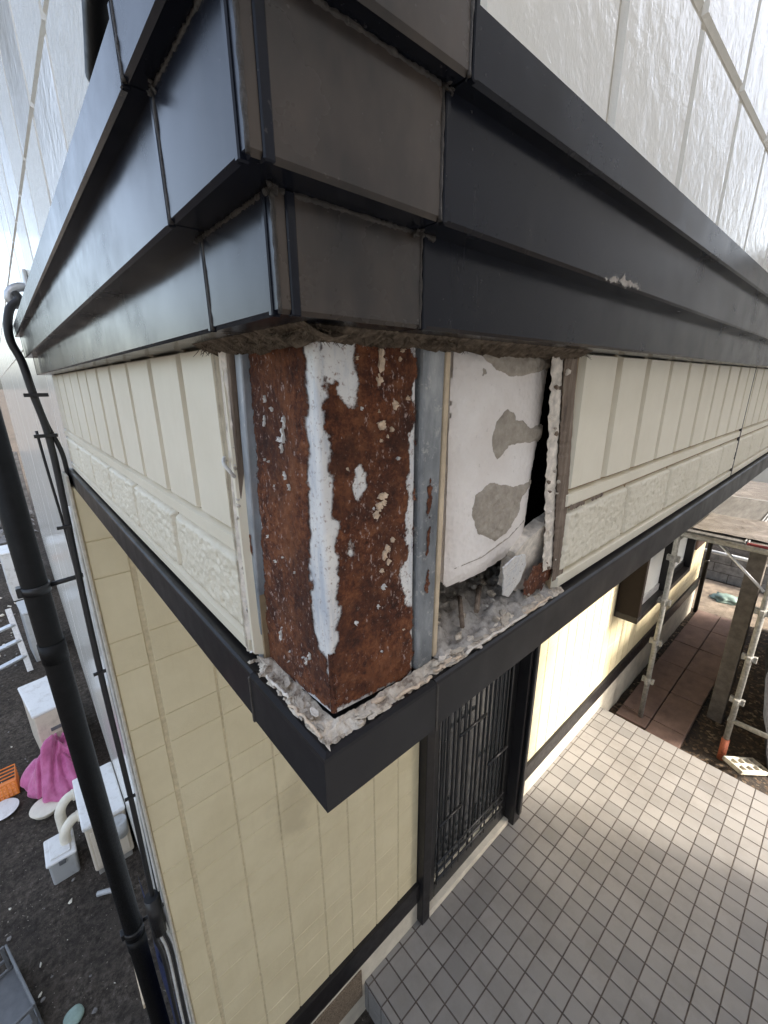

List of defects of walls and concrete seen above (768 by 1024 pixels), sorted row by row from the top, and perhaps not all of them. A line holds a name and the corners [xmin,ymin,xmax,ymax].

rust [248,344,433,714]
spalling [219,348,604,751]